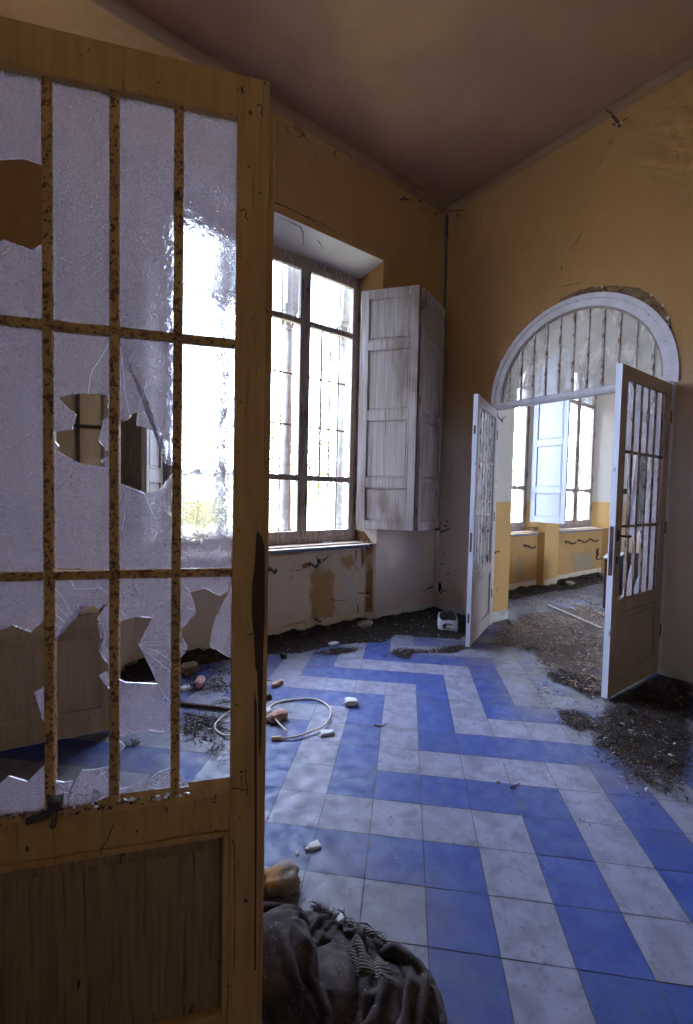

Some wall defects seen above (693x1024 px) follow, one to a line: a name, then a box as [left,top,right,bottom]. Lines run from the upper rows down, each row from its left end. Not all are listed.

spalling [532,285,671,328]
leakage [269,531,426,630]